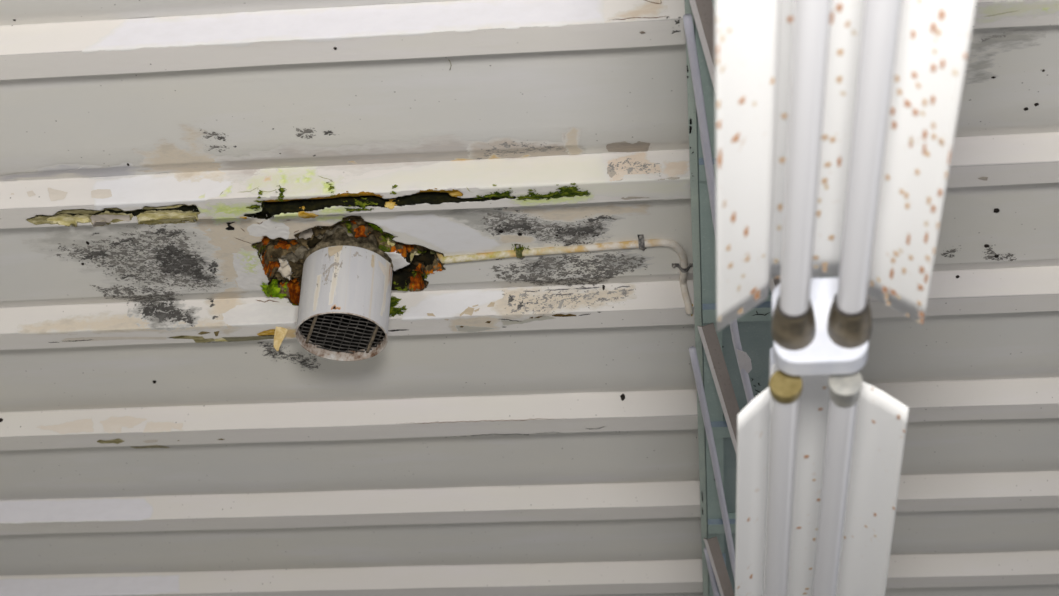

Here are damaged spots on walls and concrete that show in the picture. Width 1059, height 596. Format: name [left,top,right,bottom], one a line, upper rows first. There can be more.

peeling [606,147,694,181]
crack [196,176,595,225]
damp [17,219,238,335]
damp [435,201,655,320]
spalling [427,302,600,333]